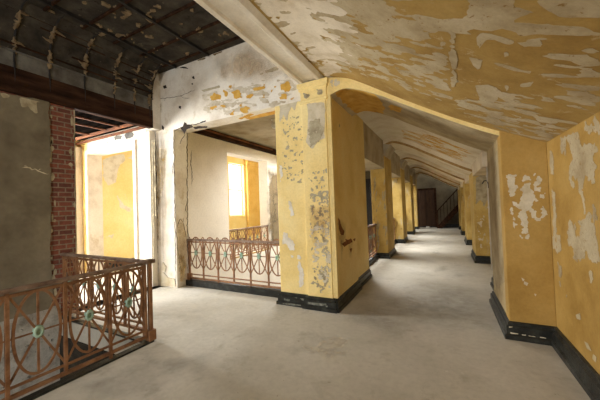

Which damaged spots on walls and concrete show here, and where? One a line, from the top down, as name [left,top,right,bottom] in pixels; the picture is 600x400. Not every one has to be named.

flaking render [20,97,39,113]
peeling [180,67,325,183]
peeling [254,0,600,293]